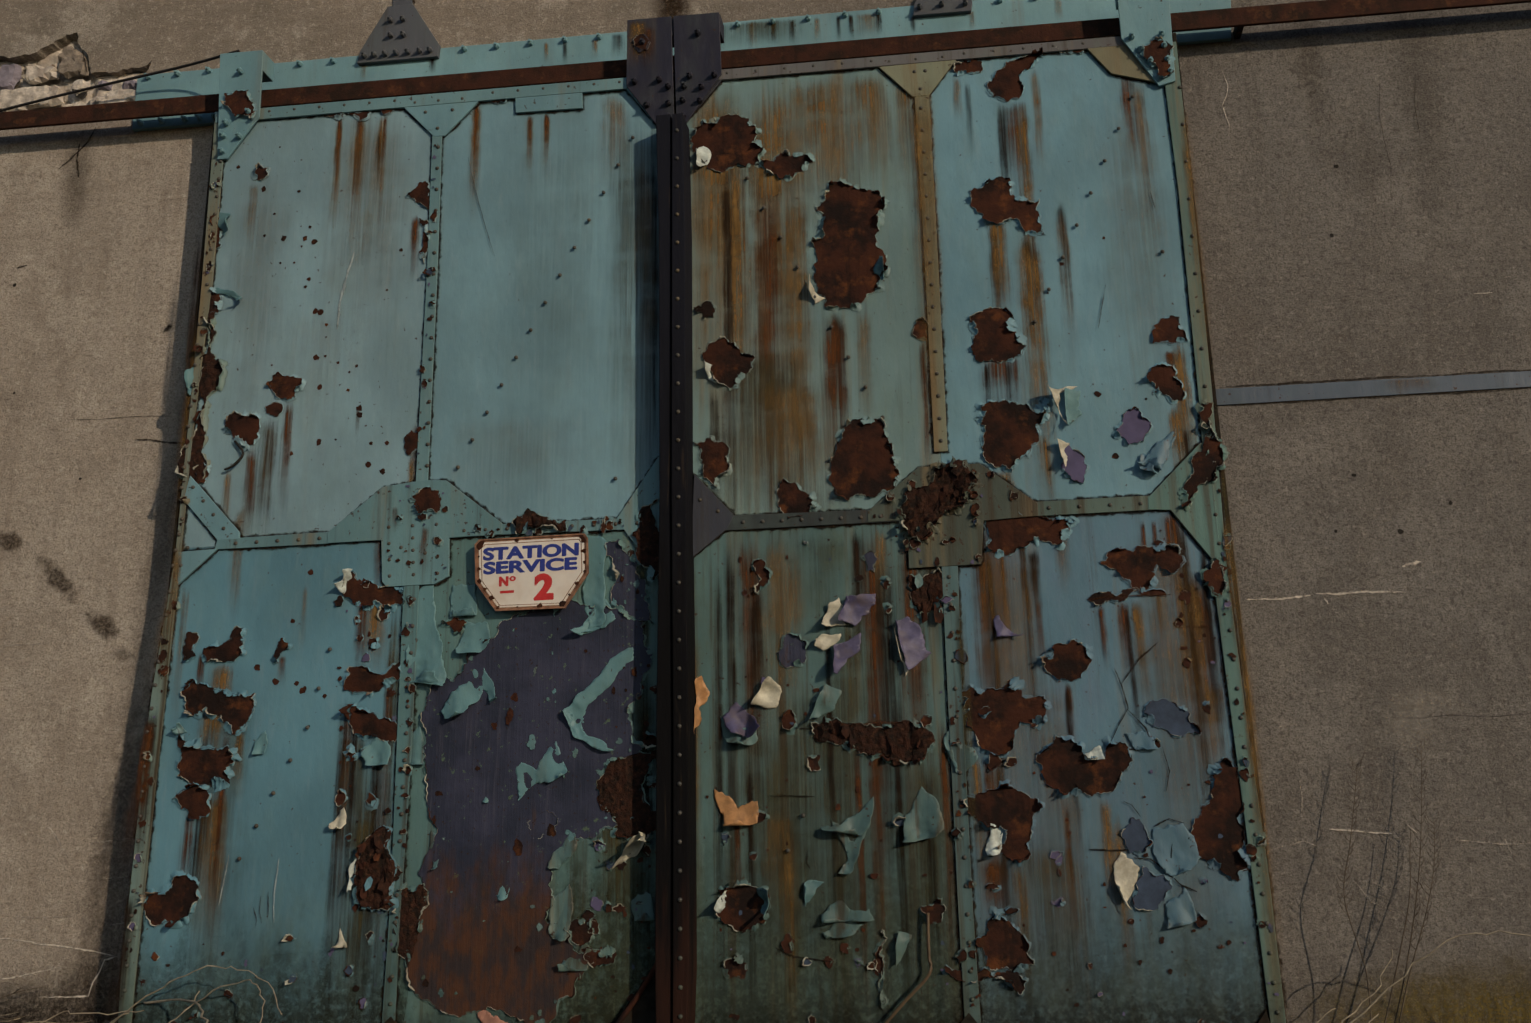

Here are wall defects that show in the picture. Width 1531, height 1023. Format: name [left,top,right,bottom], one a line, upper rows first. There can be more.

spalling [0,40,146,112]
peeling [1137,36,1176,78]
rust [1122,80,1145,145]
rust [695,81,930,296]
rust [1058,209,1069,266]
leakage [0,533,22,550]
peeling [689,46,1267,1011]
leakage [44,561,72,596]
leakage [90,616,116,636]
rust [1142,516,1218,722]
peeling [328,422,658,1023]
rust [717,536,972,973]